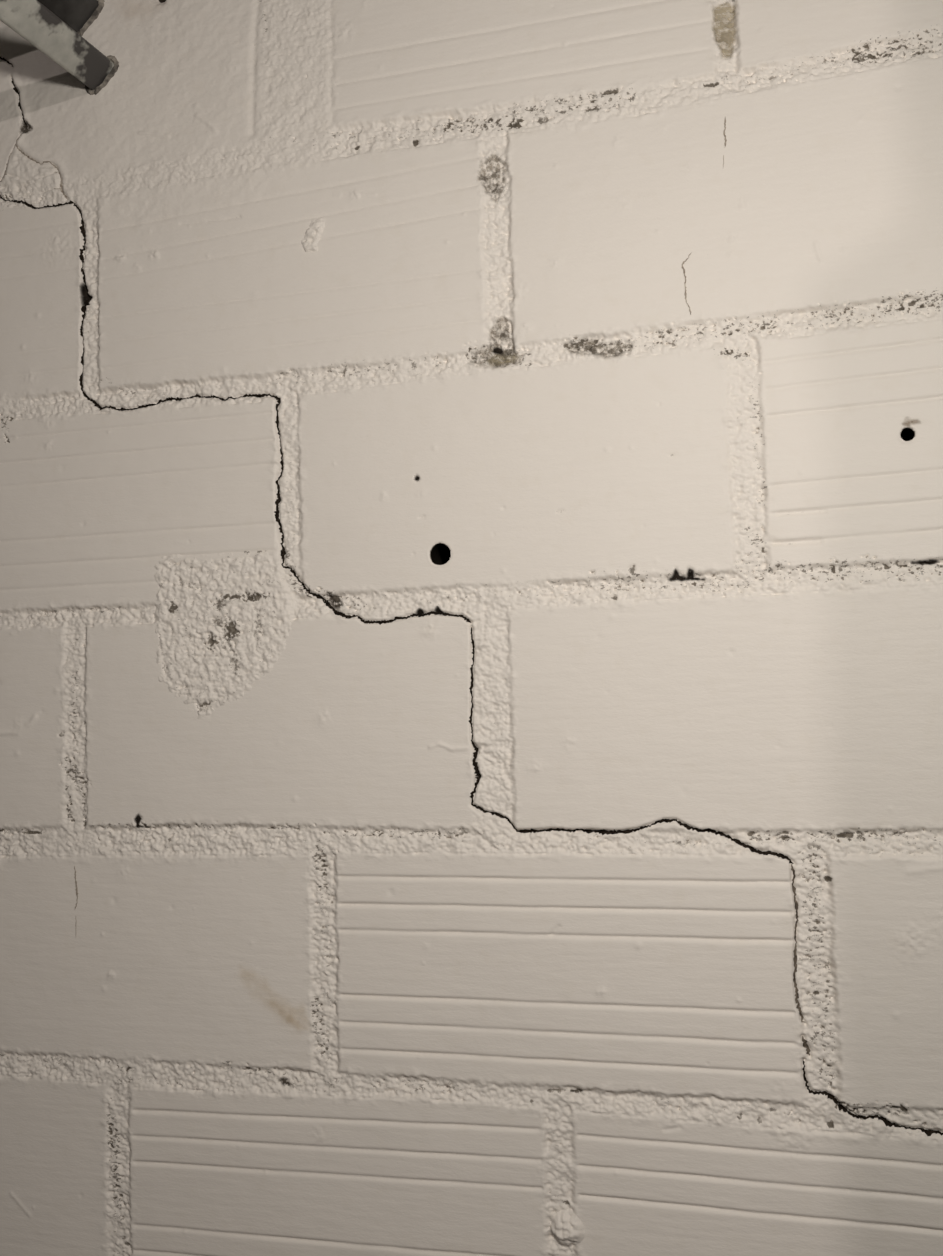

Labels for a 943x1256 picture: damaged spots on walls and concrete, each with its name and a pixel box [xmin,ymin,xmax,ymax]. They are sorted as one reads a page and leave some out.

crack [0,57,804,1022]
crack [802,1036,943,1136]